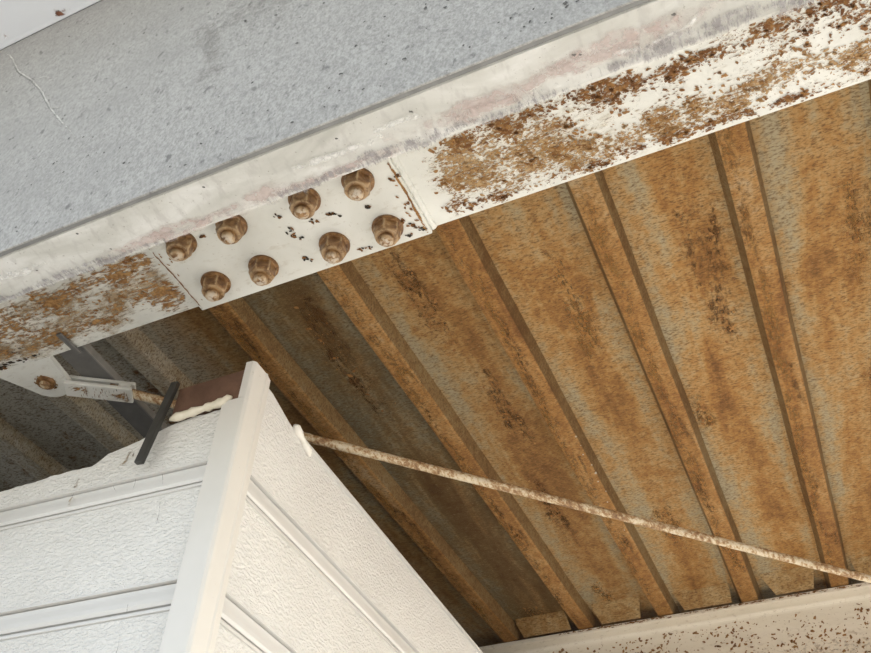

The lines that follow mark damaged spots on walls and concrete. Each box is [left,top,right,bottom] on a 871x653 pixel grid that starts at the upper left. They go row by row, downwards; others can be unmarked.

corrosion [422,0,871,214]
corrosion [0,249,202,364]
corrosion [735,204,836,541]
corrosion [578,601,871,653]
corrosion [685,583,871,614]